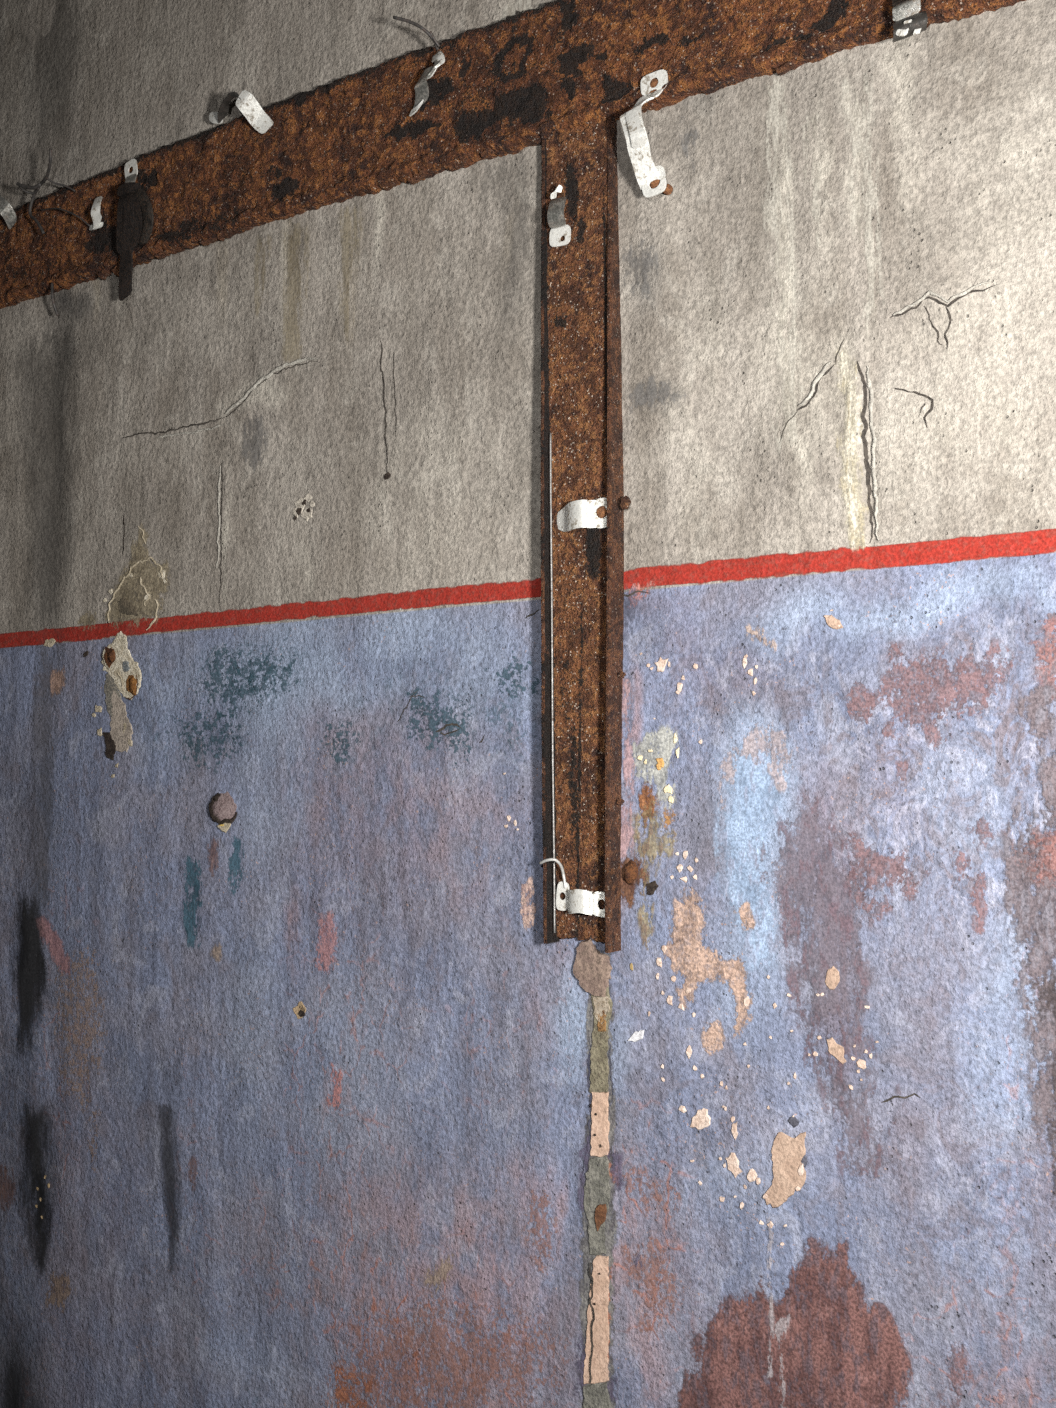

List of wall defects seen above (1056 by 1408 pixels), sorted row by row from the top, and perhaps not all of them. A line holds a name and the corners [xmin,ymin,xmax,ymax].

rust [919,0,1027,27]
rust [0,0,896,309]
crack [890,279,998,348]
crack [123,357,321,609]
crack [779,340,934,542]
spalling [78,523,170,778]
peeling [628,1011,651,1042]
peeling [656,851,807,1246]
peeling [816,966,840,996]
peeling [808,1036,879,1090]